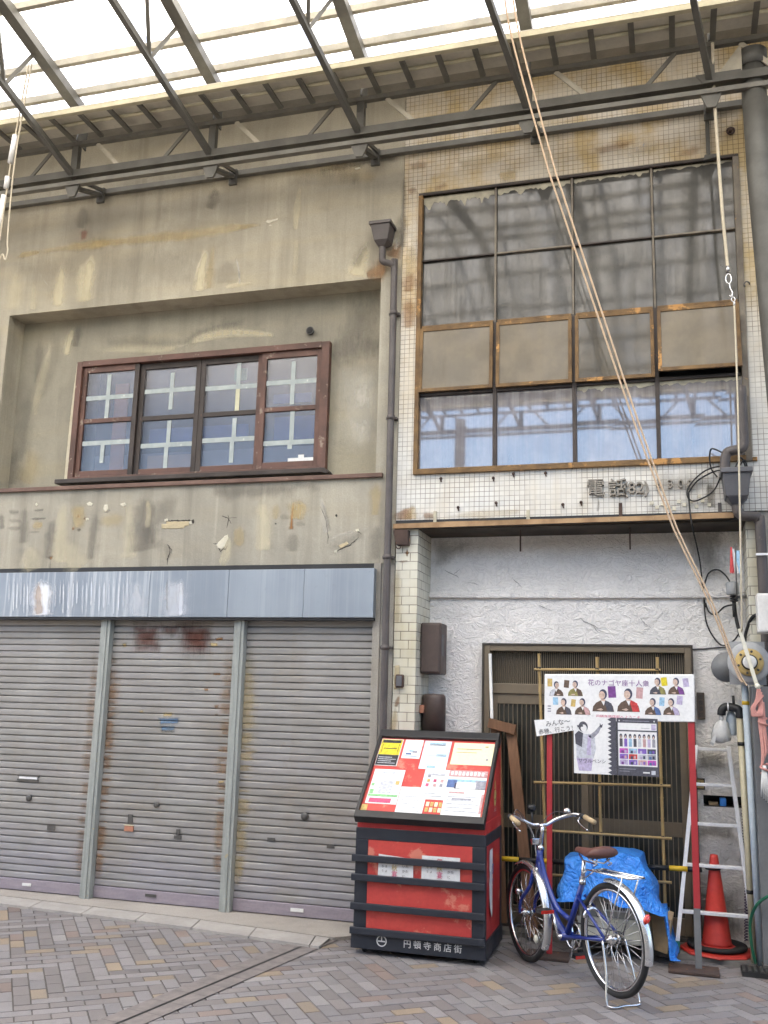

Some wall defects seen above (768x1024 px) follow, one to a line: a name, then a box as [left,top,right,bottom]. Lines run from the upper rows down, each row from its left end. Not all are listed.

flaking render [213,535,228,552]
corrosion [183,626,223,651]